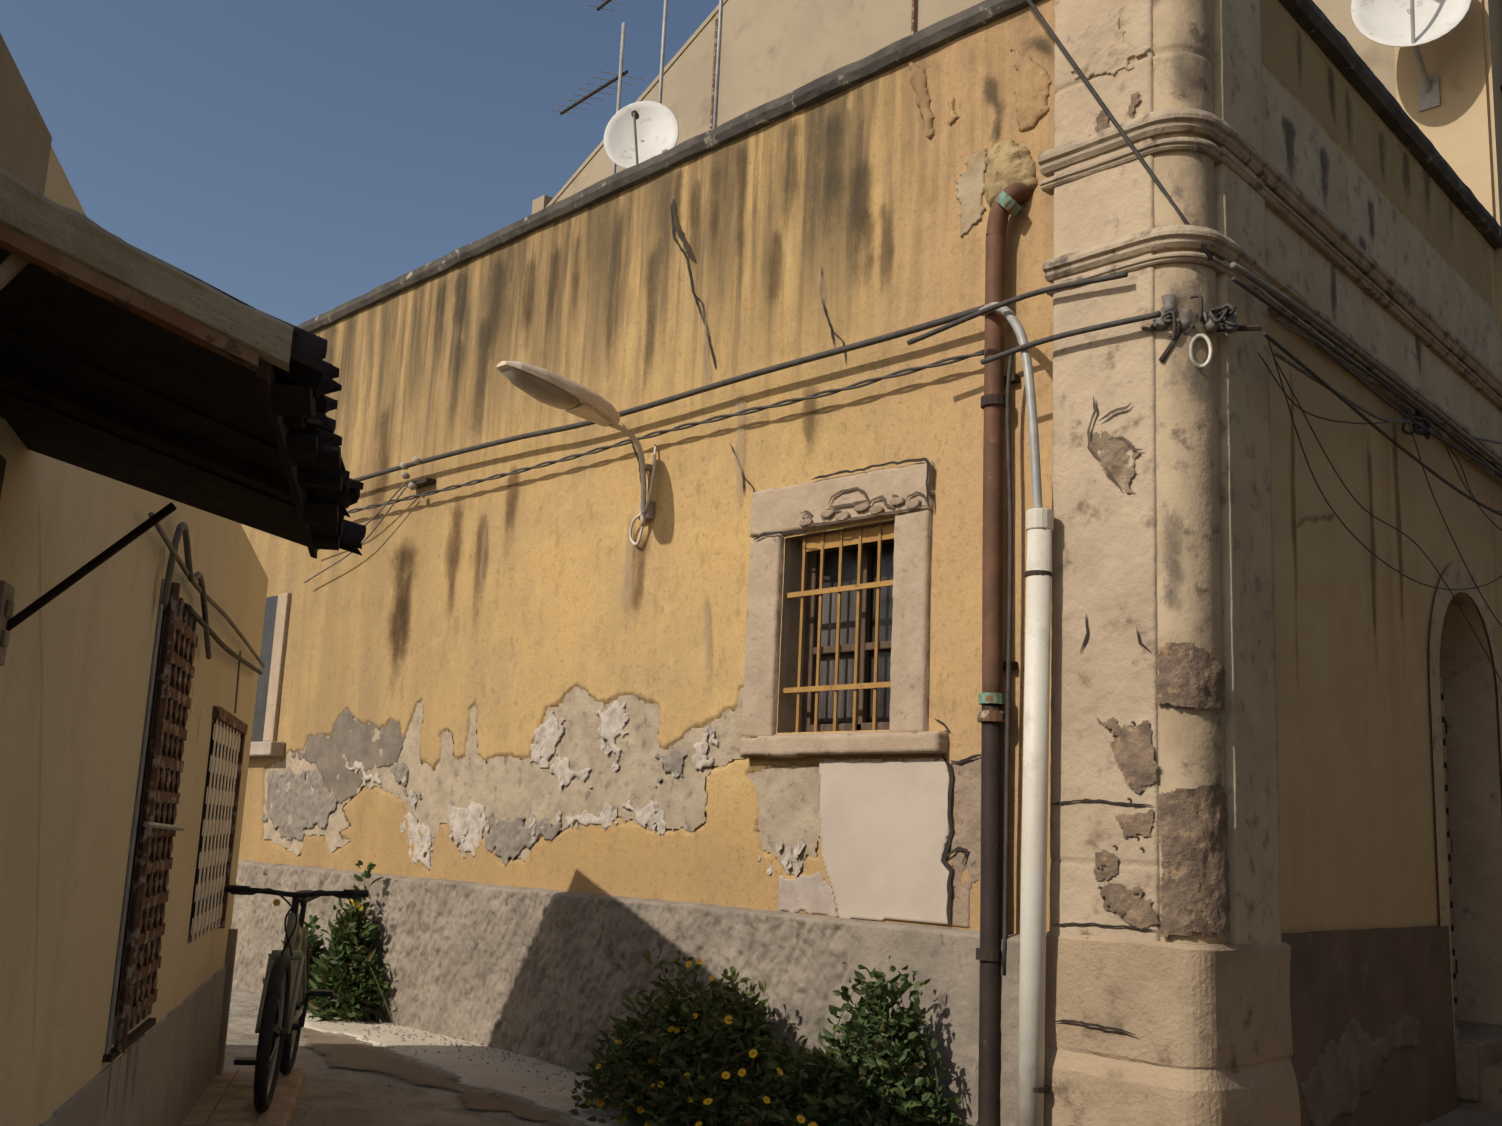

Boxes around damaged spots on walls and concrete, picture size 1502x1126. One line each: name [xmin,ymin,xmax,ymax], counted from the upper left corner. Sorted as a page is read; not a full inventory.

water stain [441,276,465,318]
water stain [476,265,503,396]
crack [670,198,716,369]
crack [819,269,846,363]
spalling [1087,396,1143,494]
spalling [1154,642,1226,710]
peeling [262,686,821,877]
spalling [946,757,981,928]
crack [1050,798,1152,806]
spalling [1094,717,1231,937]
crack [1052,922,1156,931]